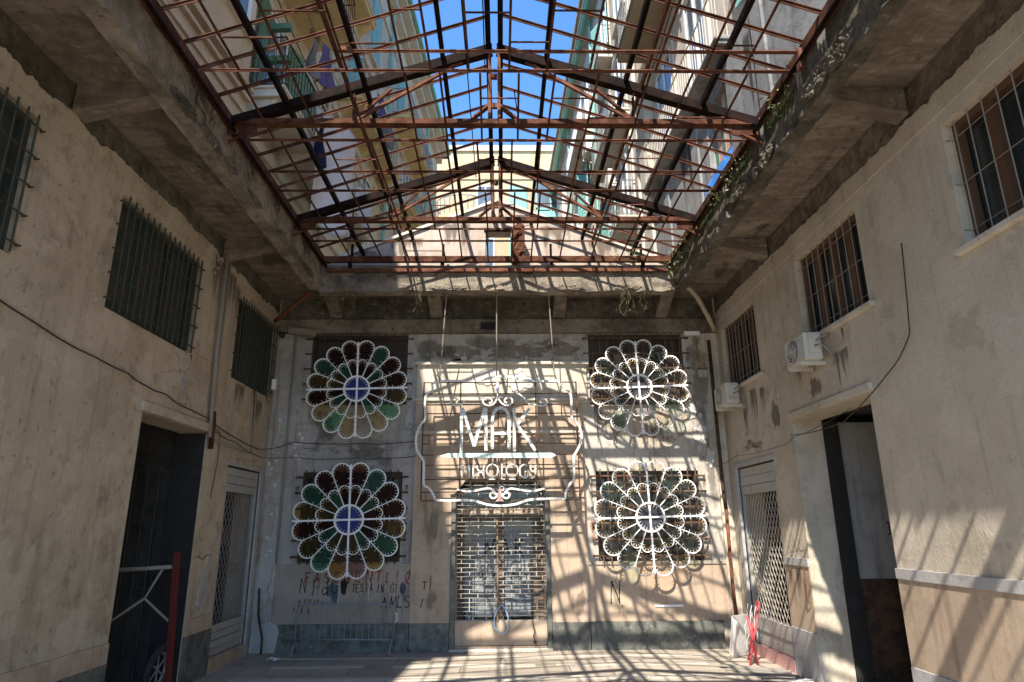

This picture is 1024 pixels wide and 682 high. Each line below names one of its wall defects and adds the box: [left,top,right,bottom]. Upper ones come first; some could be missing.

water stain [743,29,754,96]
peeling [427,339,580,392]